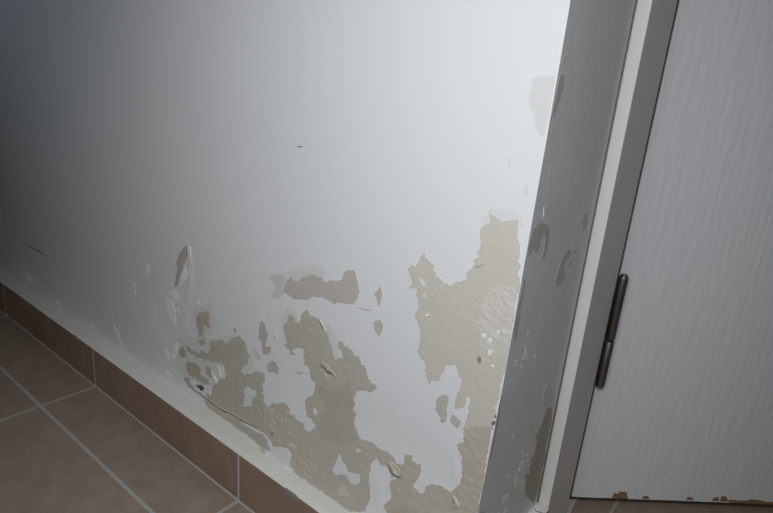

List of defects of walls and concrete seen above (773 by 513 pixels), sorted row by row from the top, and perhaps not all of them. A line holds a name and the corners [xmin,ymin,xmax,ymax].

peeling [552,73,564,118]
peeling [173,213,553,513]
crack [187,382,262,432]